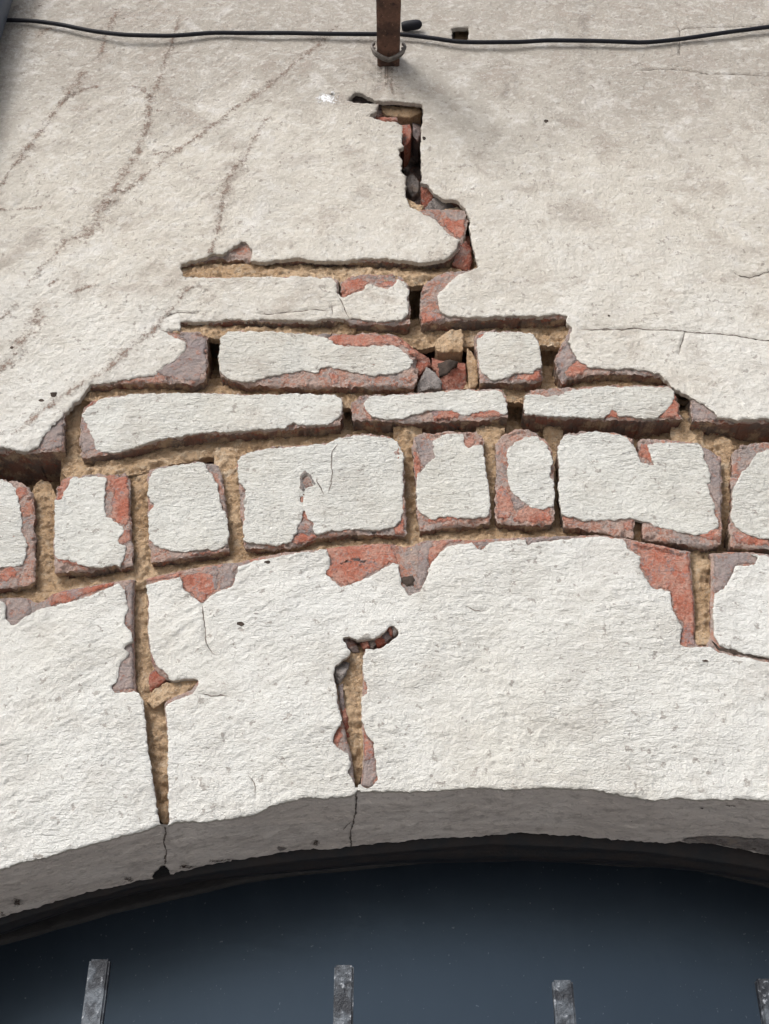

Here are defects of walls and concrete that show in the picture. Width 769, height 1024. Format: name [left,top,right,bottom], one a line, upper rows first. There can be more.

rust [370,0,407,87]
crack [267,298,350,320]
peeling [158,332,207,382]
peeling [328,334,416,357]
peeling [555,336,588,381]
peeling [51,582,134,628]
peeling [147,564,238,603]
peeling [326,519,488,589]
peeling [623,519,695,647]
peeling [699,529,769,593]
crack [128,559,226,864]
crack [334,627,398,847]